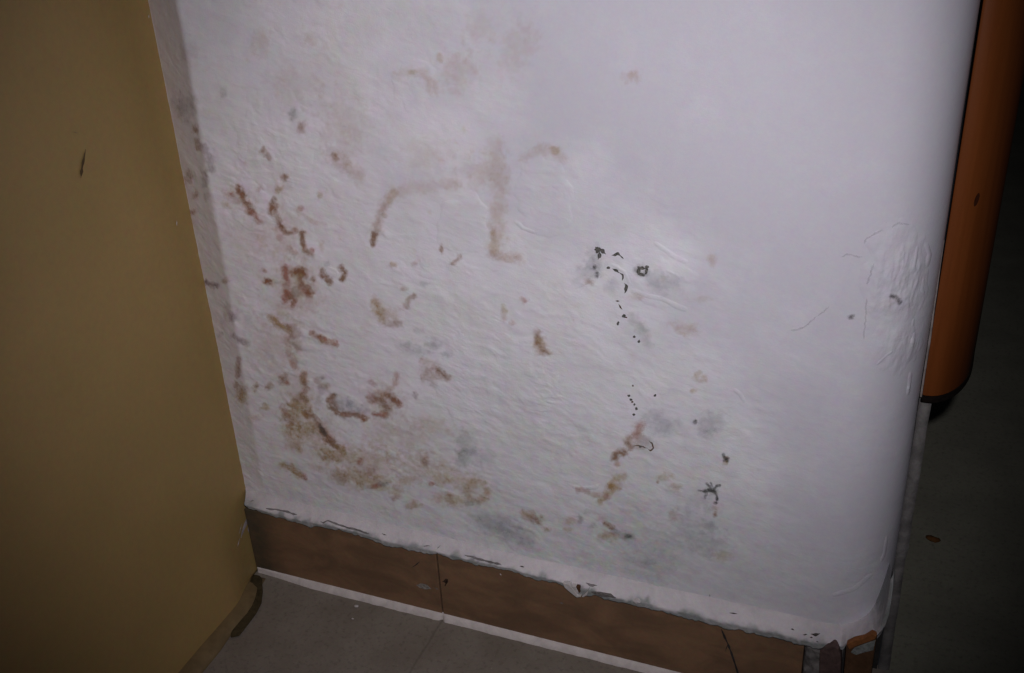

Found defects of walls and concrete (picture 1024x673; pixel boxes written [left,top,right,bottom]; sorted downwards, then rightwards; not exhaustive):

flaking render [563,581,616,598]